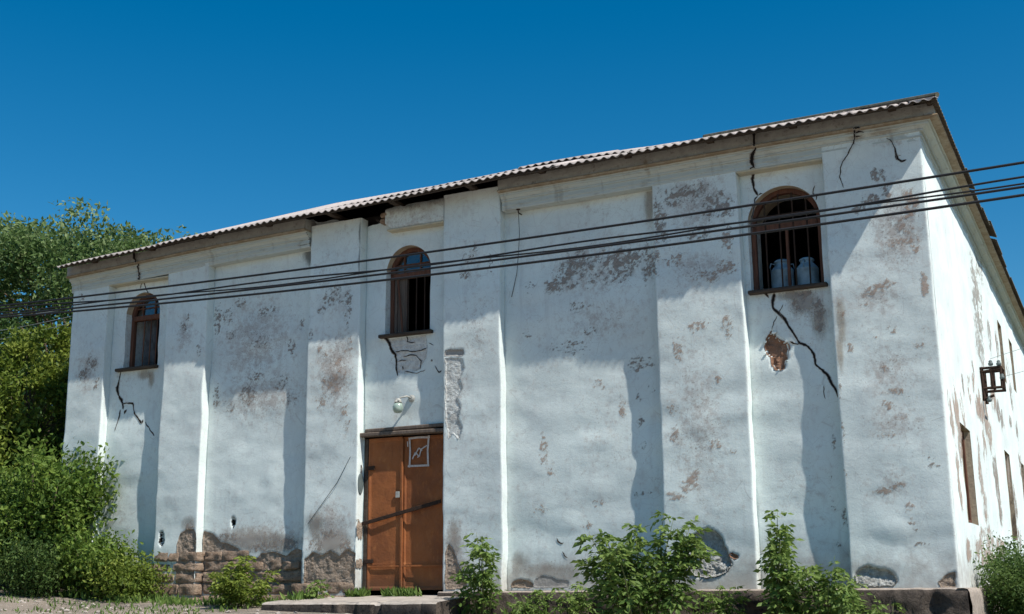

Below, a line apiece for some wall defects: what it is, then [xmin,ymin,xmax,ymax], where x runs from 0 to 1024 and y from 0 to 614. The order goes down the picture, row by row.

crack [749,133,763,232]
crack [839,126,906,188]
flaking render [530,182,736,291]
crack [132,253,148,293]
crack [385,336,442,376]
spalling [764,331,790,371]
crack [764,293,838,398]
crack [115,372,154,436]
spalling [444,349,464,439]
flaking render [150,517,363,604]
spalling [683,529,738,578]
spalling [855,565,897,587]